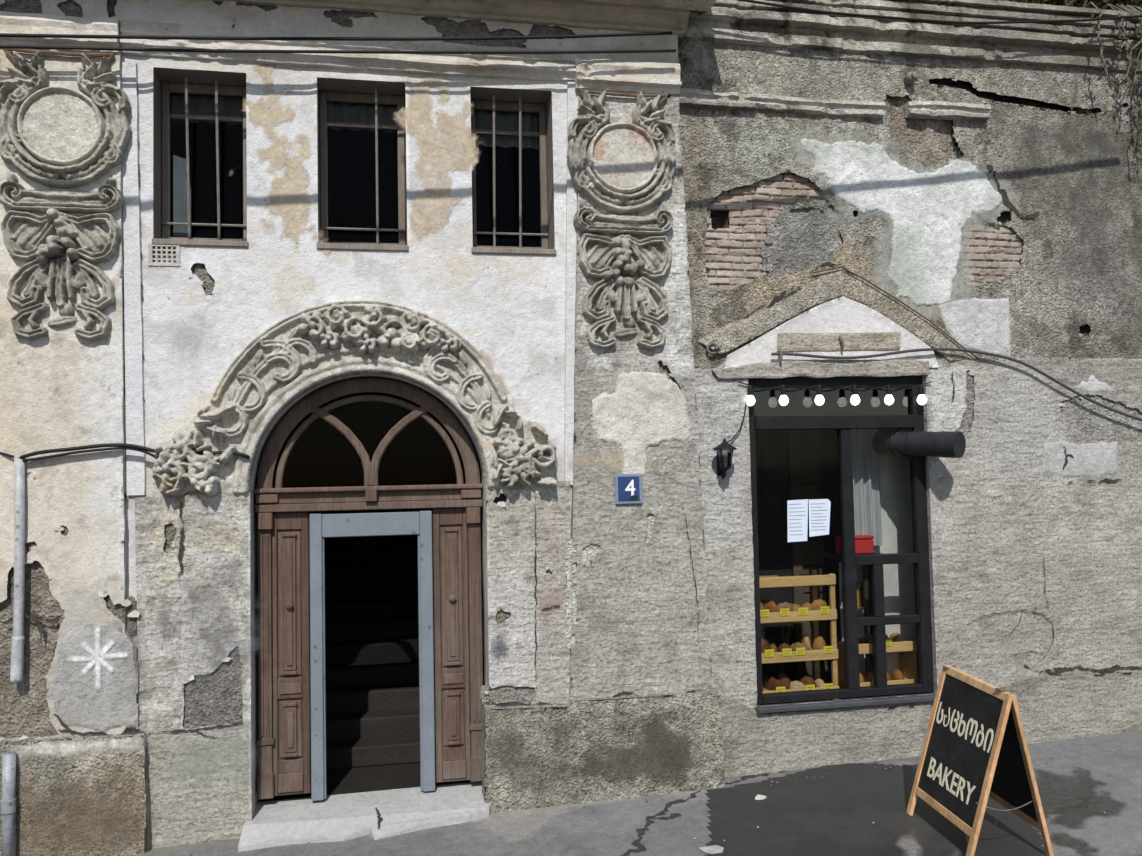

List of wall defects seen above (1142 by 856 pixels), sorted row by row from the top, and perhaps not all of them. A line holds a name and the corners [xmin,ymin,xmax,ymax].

peeling [421,17,575,48]
peeling [244,63,331,255]
peeling [395,74,478,236]
spalling [884,93,964,170]
flaking render [703,171,858,290]
flaking render [960,211,1024,286]
spalling [0,542,65,742]
spalling [180,646,243,728]
crack [967,556,1142,676]
crack [620,770,788,856]